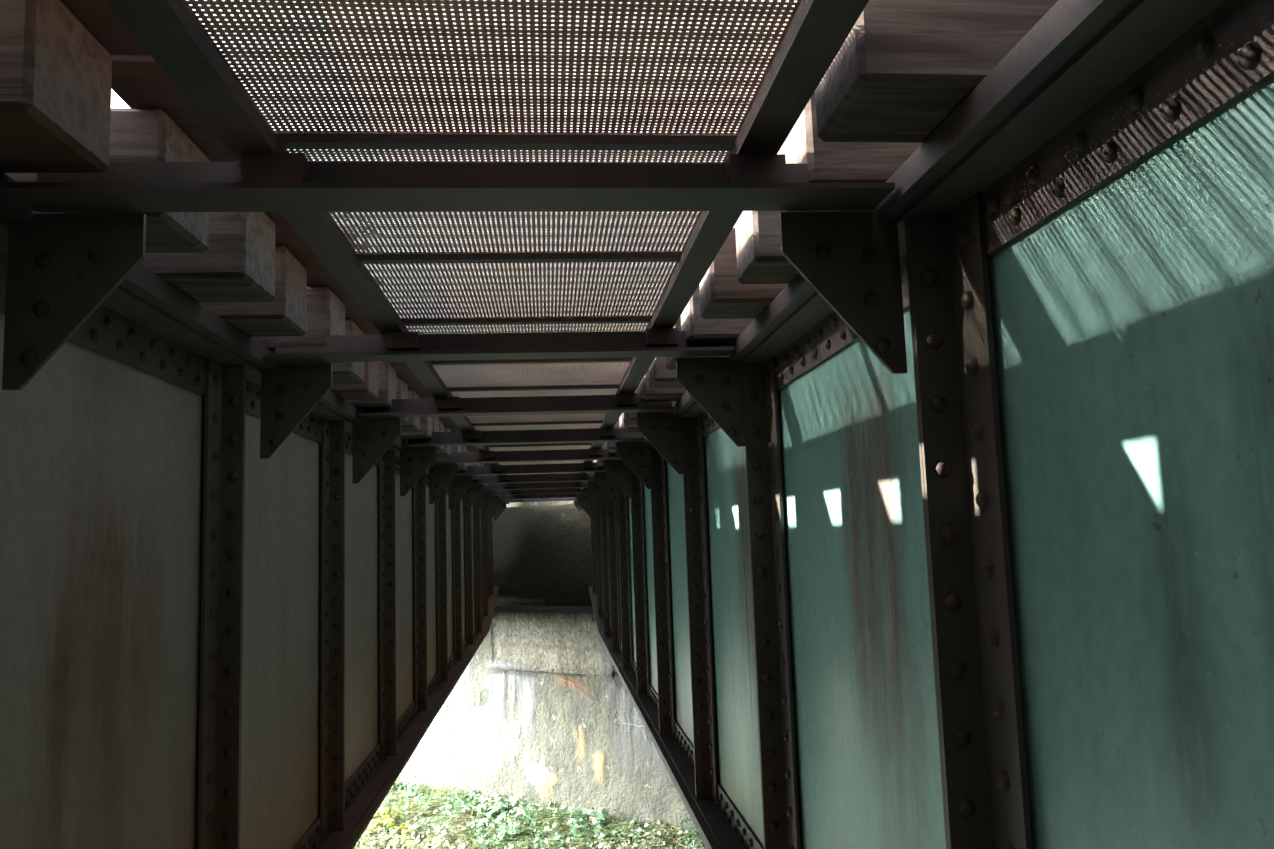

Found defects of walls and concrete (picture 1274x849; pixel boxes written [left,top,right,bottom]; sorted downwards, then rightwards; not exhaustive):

leakage [456,663,534,746]